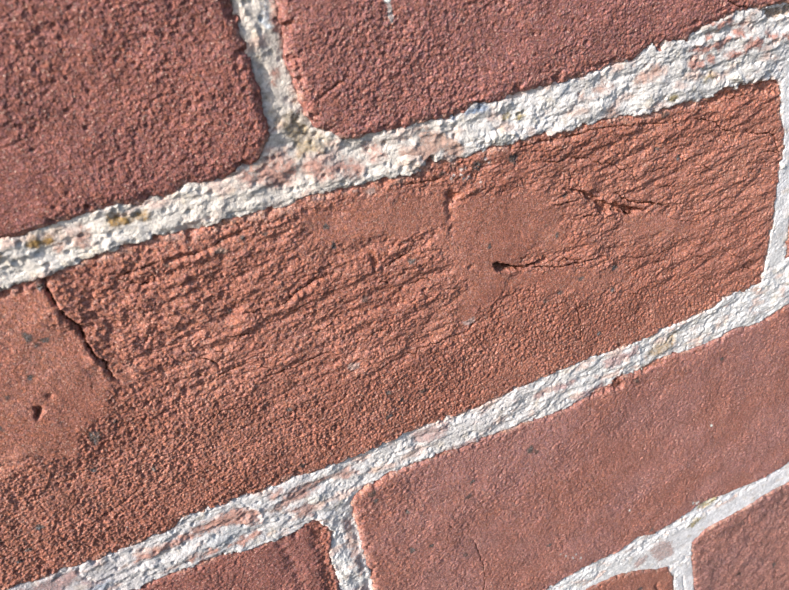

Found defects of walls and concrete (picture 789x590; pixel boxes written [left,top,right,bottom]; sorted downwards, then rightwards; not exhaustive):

crack [513,118,782,222]
crack [492,256,607,269]
crack [629,242,721,295]
crack [44,277,117,380]